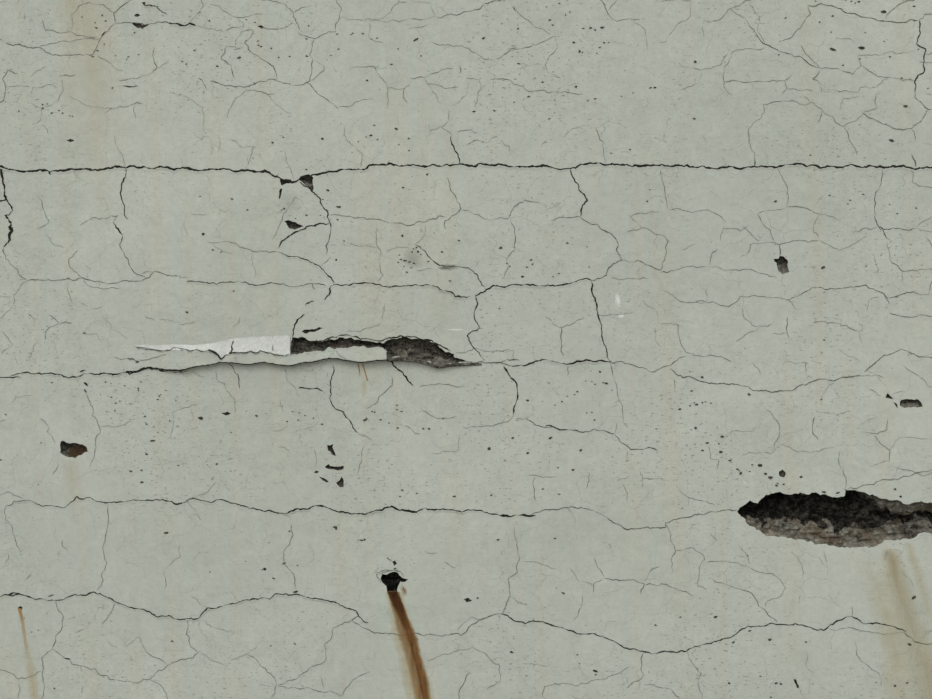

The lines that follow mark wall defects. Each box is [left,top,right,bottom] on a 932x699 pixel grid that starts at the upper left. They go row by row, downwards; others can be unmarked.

crack [0,0,932,490]
peeling [774,256,789,274]
spalling [135,327,465,365]
peeling [60,441,88,458]
spalling [695,435,932,548]
crack [0,472,932,699]
corrosion [388,589,430,699]